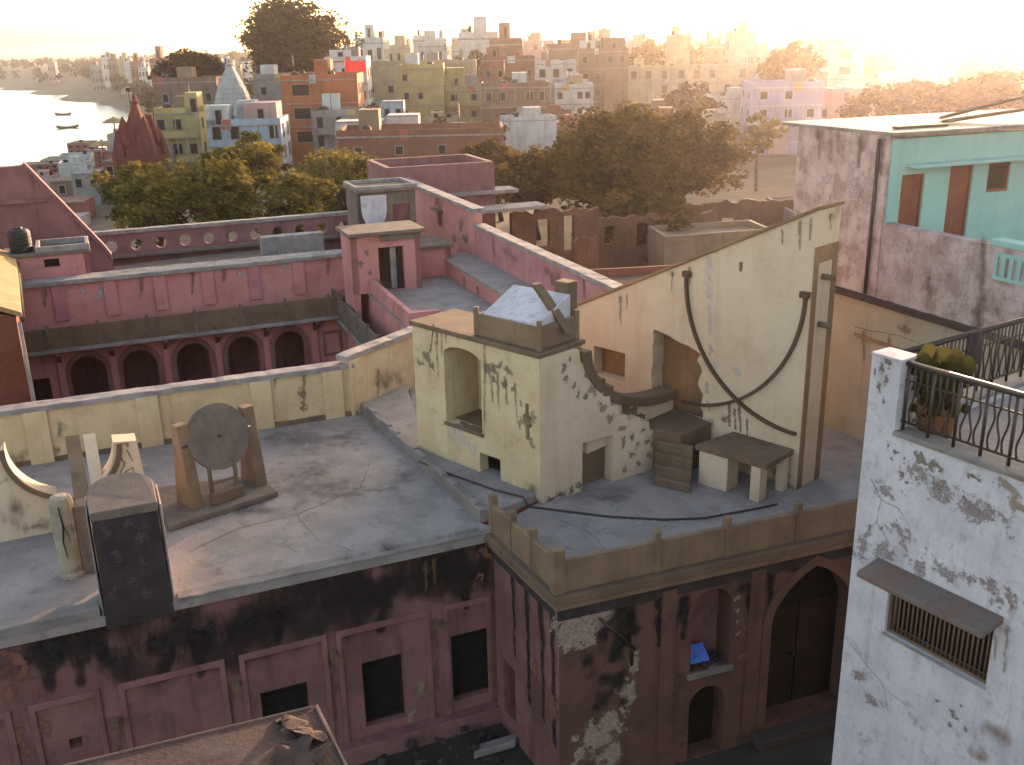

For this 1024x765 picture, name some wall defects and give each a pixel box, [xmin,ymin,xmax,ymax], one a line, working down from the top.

peeling [562,357,653,472]
peeling [874,358,892,403]
crack [58,507,71,558]
crack [188,470,413,552]
crack [871,479,910,543]
peeling [852,518,1024,612]
peeling [872,444,1024,540]
water stain [21,543,492,691]
water stain [511,576,556,746]
peeling [548,609,615,655]
peeling [570,648,641,765]